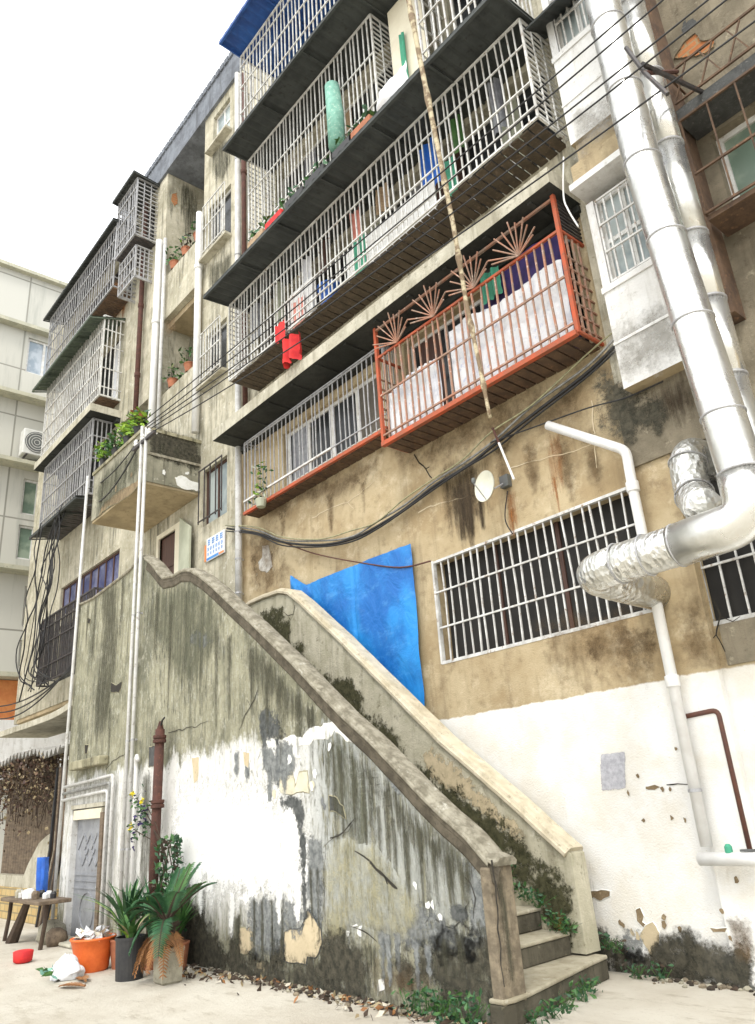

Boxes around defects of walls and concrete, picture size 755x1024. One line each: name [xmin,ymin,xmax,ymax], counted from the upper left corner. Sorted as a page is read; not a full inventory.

flaking render [673,18,716,60]
leakage [594,370,692,445]
peeling [162,470,200,492]
leakage [444,467,484,540]
leakage [149,581,232,711]
leakage [250,650,314,758]
peeling [243,722,353,819]
leakage [181,739,493,1012]
crack [330,818,397,889]
peeling [238,889,323,967]
spalling [618,907,667,958]
mould [593,921,755,991]